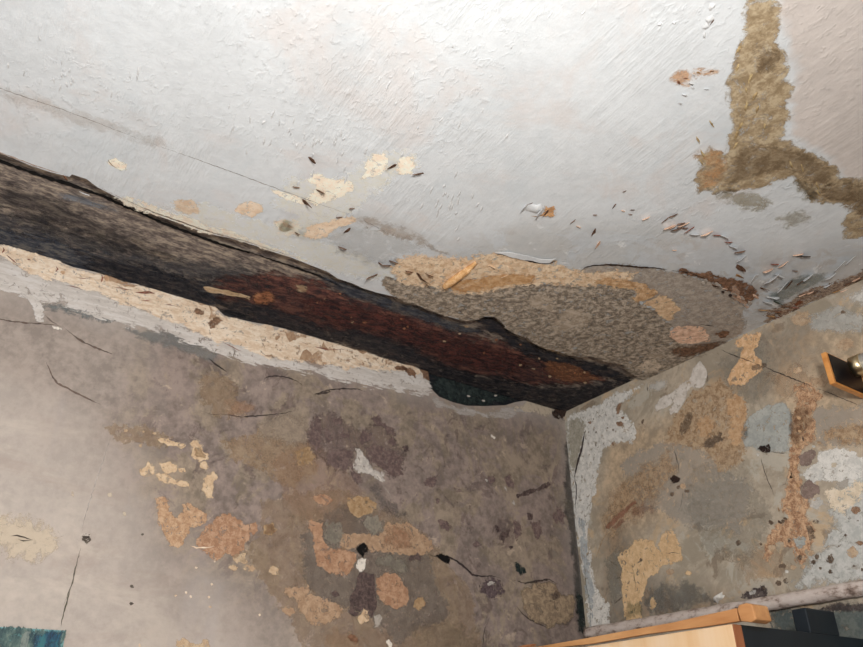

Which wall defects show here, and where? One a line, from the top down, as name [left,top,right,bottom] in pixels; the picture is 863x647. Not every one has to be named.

leakage [694,0,863,239]
crack [0,319,111,354]
crack [47,365,99,404]
flaking render [0,148,863,647]
crack [61,549,81,624]
crack [431,555,554,584]
leakage [740,585,768,599]
leakage [576,593,586,633]
leakage [769,609,796,631]
leakage [821,603,863,639]